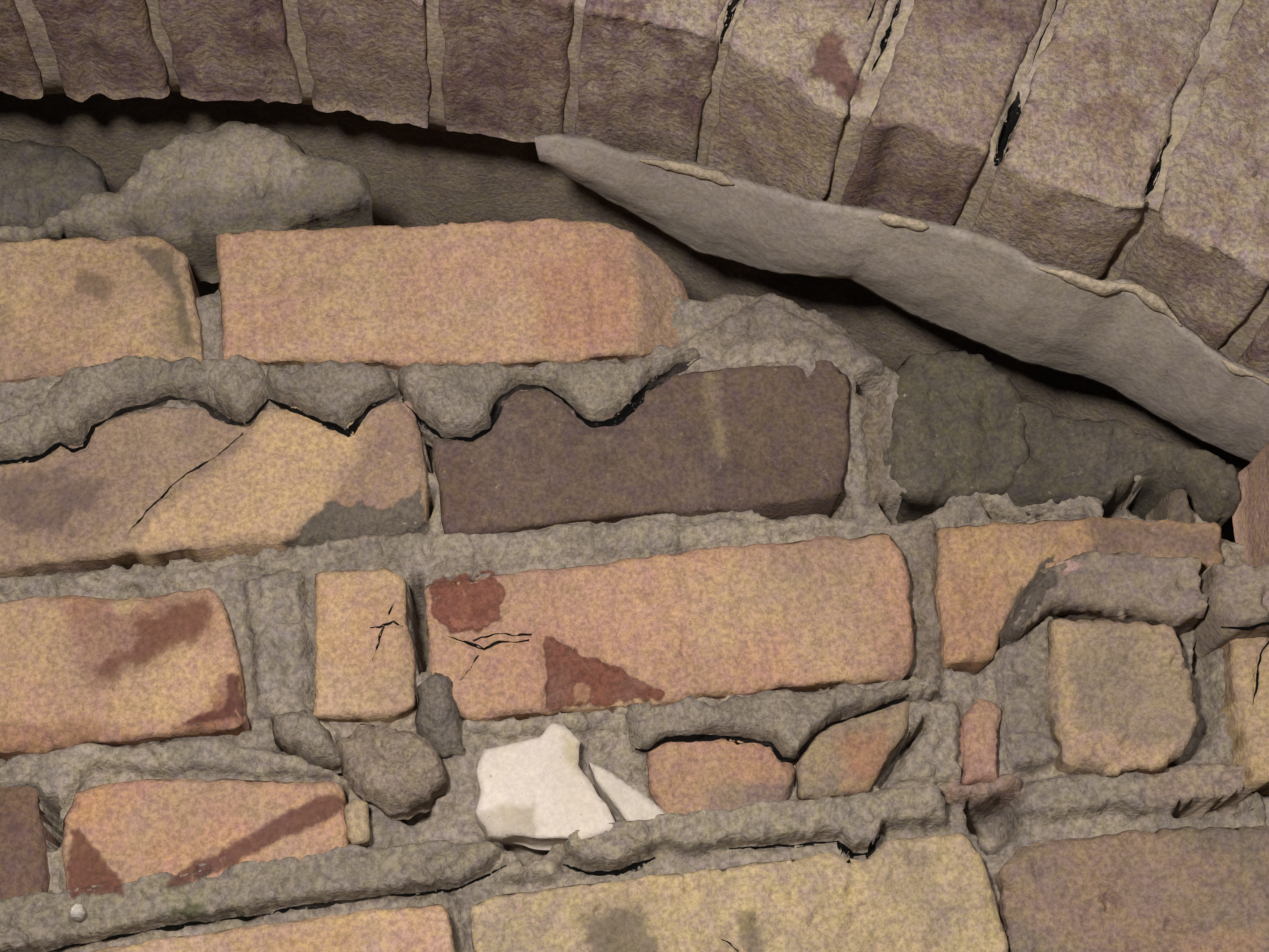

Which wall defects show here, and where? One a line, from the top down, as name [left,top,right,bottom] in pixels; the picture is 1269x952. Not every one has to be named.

crack [720,0,742,44]
crack [994,0,1058,166]
crack [0,357,701,528]
crack [448,633,532,676]